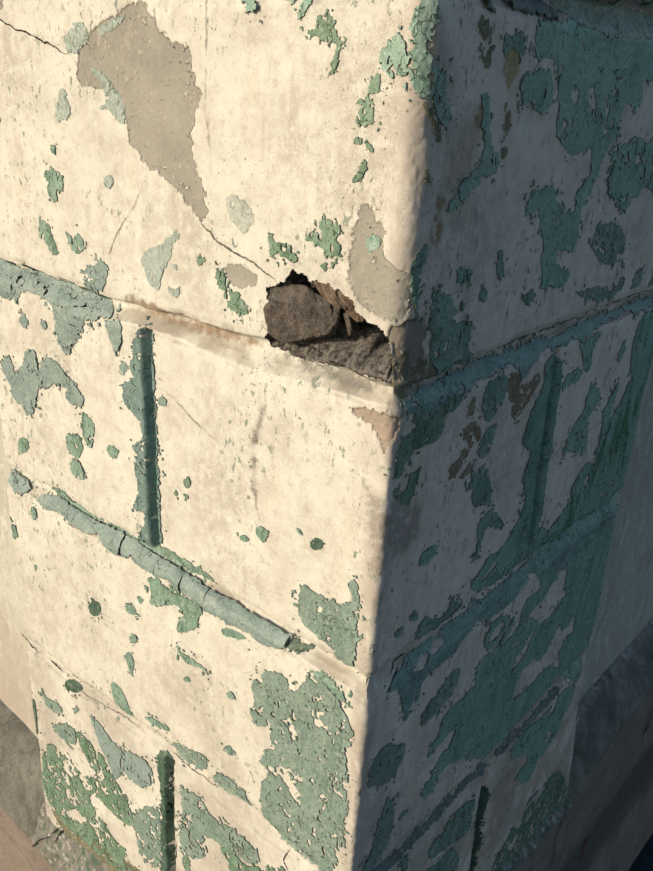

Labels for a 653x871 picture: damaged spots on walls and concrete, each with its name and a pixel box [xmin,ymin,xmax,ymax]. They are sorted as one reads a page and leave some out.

crack [0,19,74,59]
peeling [55,88,71,123]
flaking render [64,1,209,222]
peeling [44,163,64,203]
peeling [38,216,59,259]
crack [201,223,279,285]
peeling [0,224,217,585]
peeling [196,0,653,871]
peeling [88,598,103,622]
peeling [123,574,211,680]
peeling [31,662,356,871]